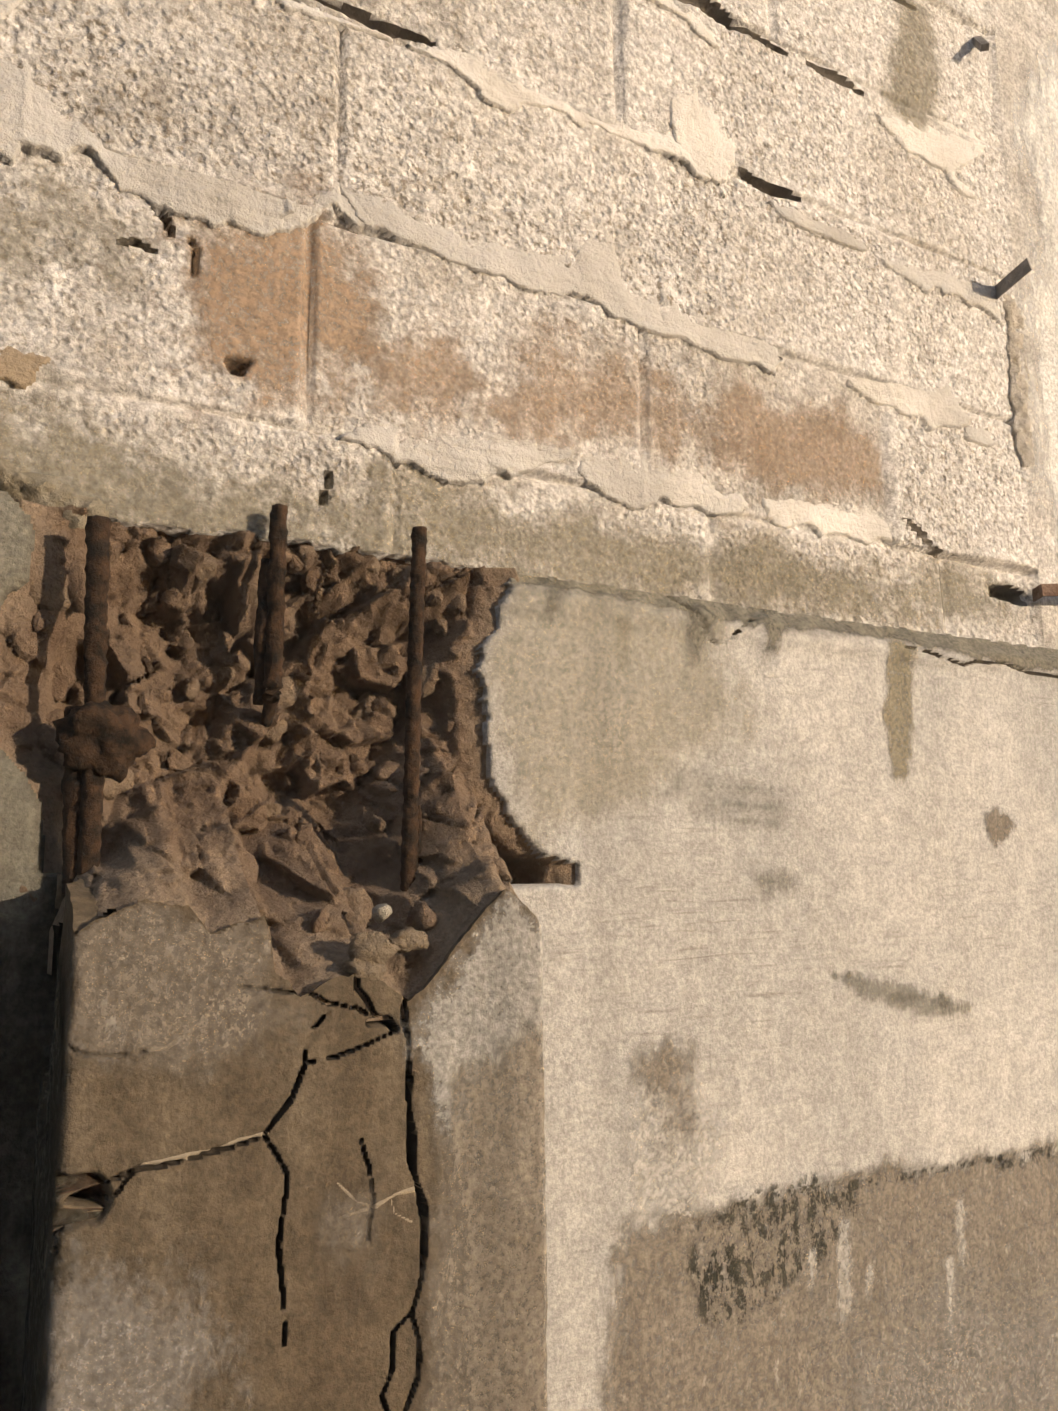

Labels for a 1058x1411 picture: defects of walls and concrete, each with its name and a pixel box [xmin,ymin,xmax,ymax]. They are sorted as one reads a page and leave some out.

peeling [185,216,473,413]
spalling [0,455,576,1028]
crack [68,1043,148,1059]
damp [0,874,287,1411]
crack [100,976,429,1411]
damp [635,1037,696,1143]
damp [603,1138,1058,1411]